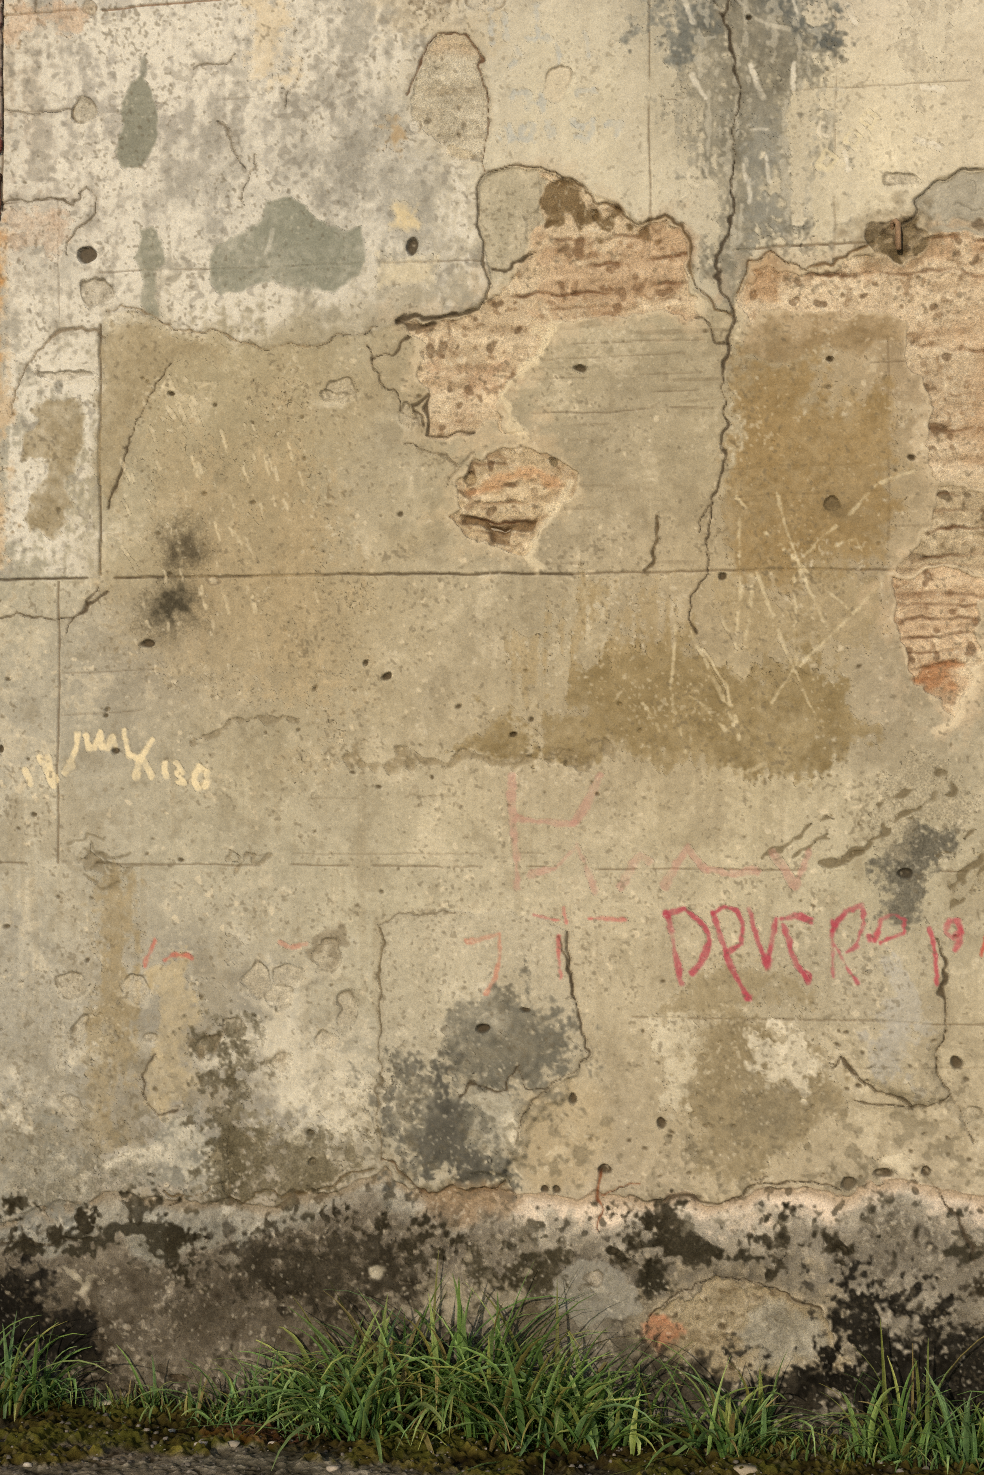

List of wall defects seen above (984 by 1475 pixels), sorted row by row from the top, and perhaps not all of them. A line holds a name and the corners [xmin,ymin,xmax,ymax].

rust [0,205,75,570]
crack [0,32,984,637]
spalling [399,34,699,556]
leakage [444,309,913,786]
crack [712,0,743,118]
leakage [619,0,849,307]
spalling [736,170,984,716]
leakage [865,749,984,933]
leakage [0,859,580,1412]
crack [595,1172,835,1230]
crack [831,938,952,1110]
crack [945,1205,979,1264]